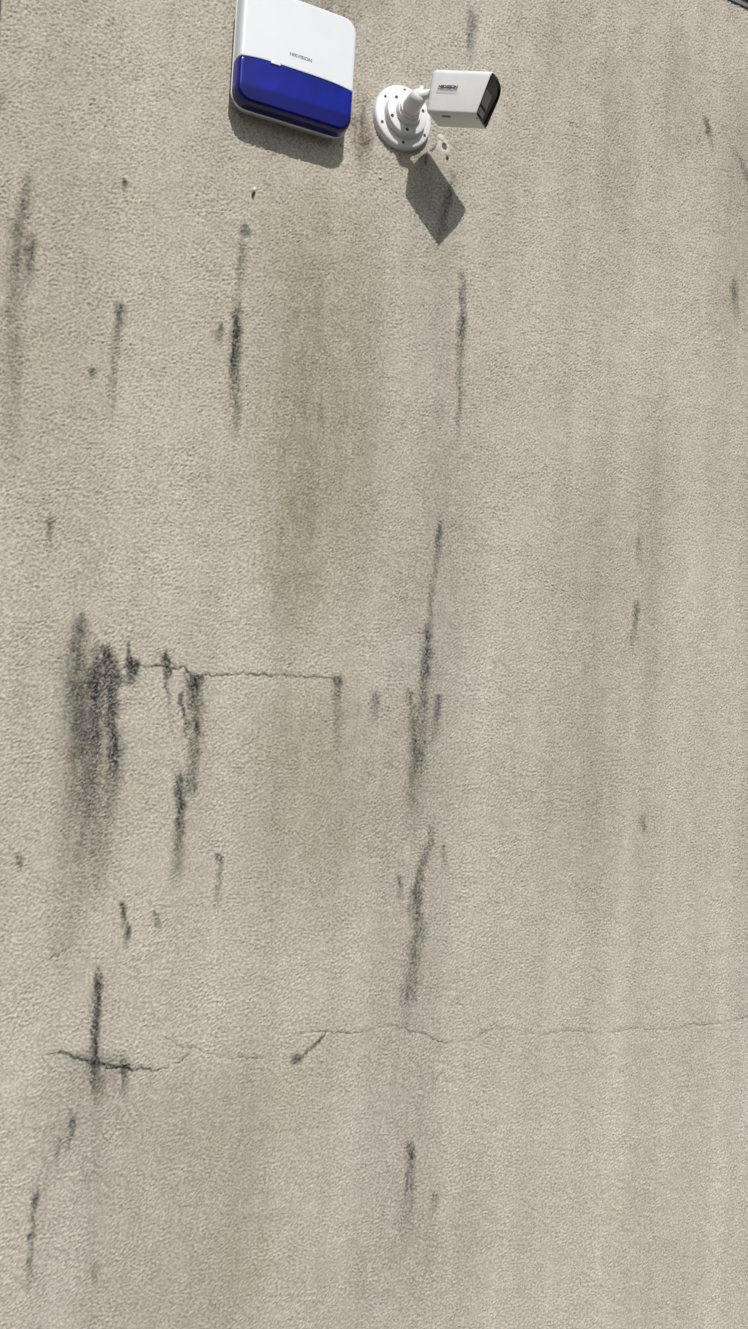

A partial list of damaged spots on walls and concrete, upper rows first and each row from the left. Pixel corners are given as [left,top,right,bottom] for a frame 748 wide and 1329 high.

damp [219,312,241,383]
damp [70,622,139,777]
damp [179,677,200,736]
damp [175,776,185,850]
damp [91,977,102,1080]